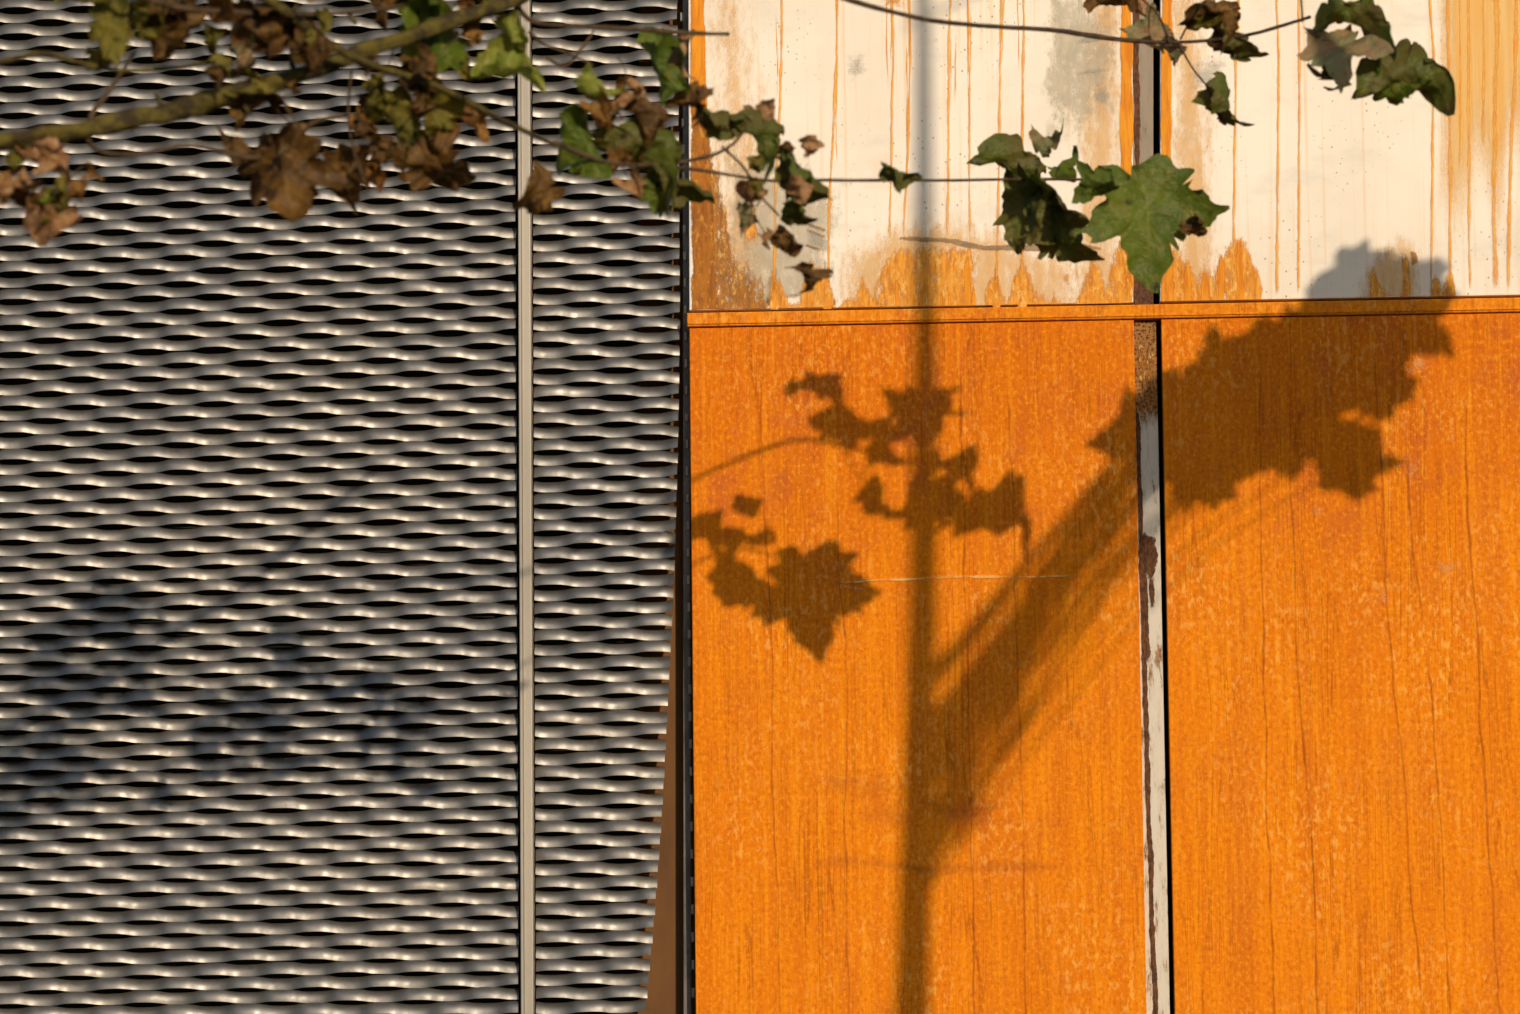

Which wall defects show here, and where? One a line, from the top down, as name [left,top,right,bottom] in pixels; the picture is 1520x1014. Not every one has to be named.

corrosion [690,0,1141,310]
corrosion [1160,0,1280,301]
corrosion [1370,0,1520,297]
corrosion [1136,345,1158,1014]